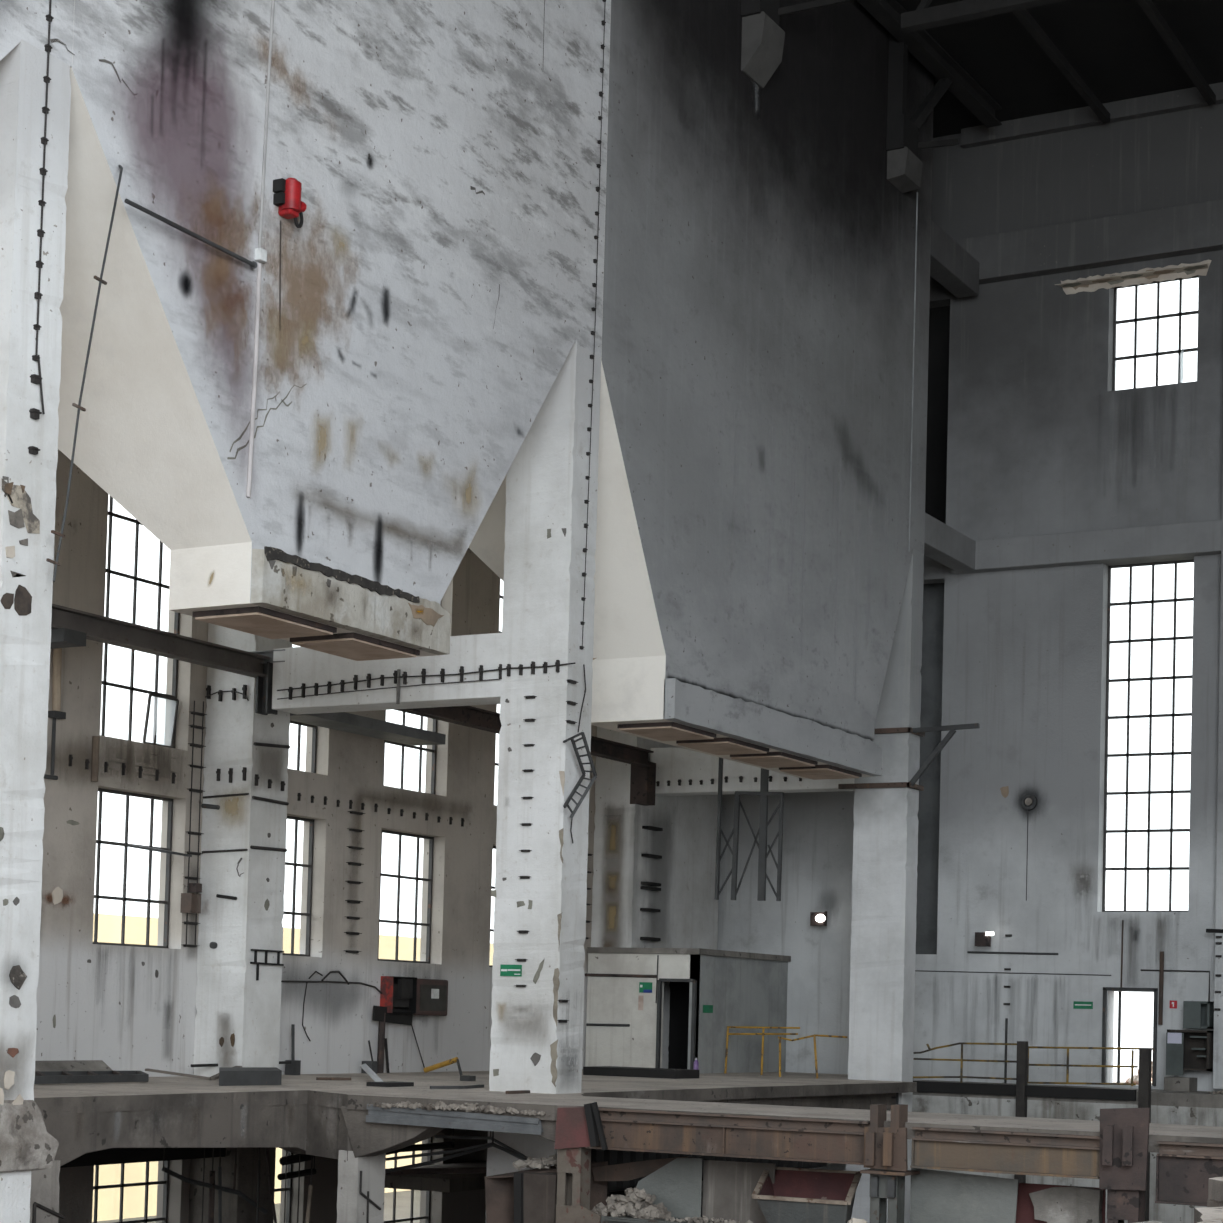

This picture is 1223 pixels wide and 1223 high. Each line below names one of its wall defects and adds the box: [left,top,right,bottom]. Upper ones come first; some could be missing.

corrosion [269,231,331,371]
crack [227,384,306,459]
spalling [0,479,40,616]
spalling [264,546,444,627]